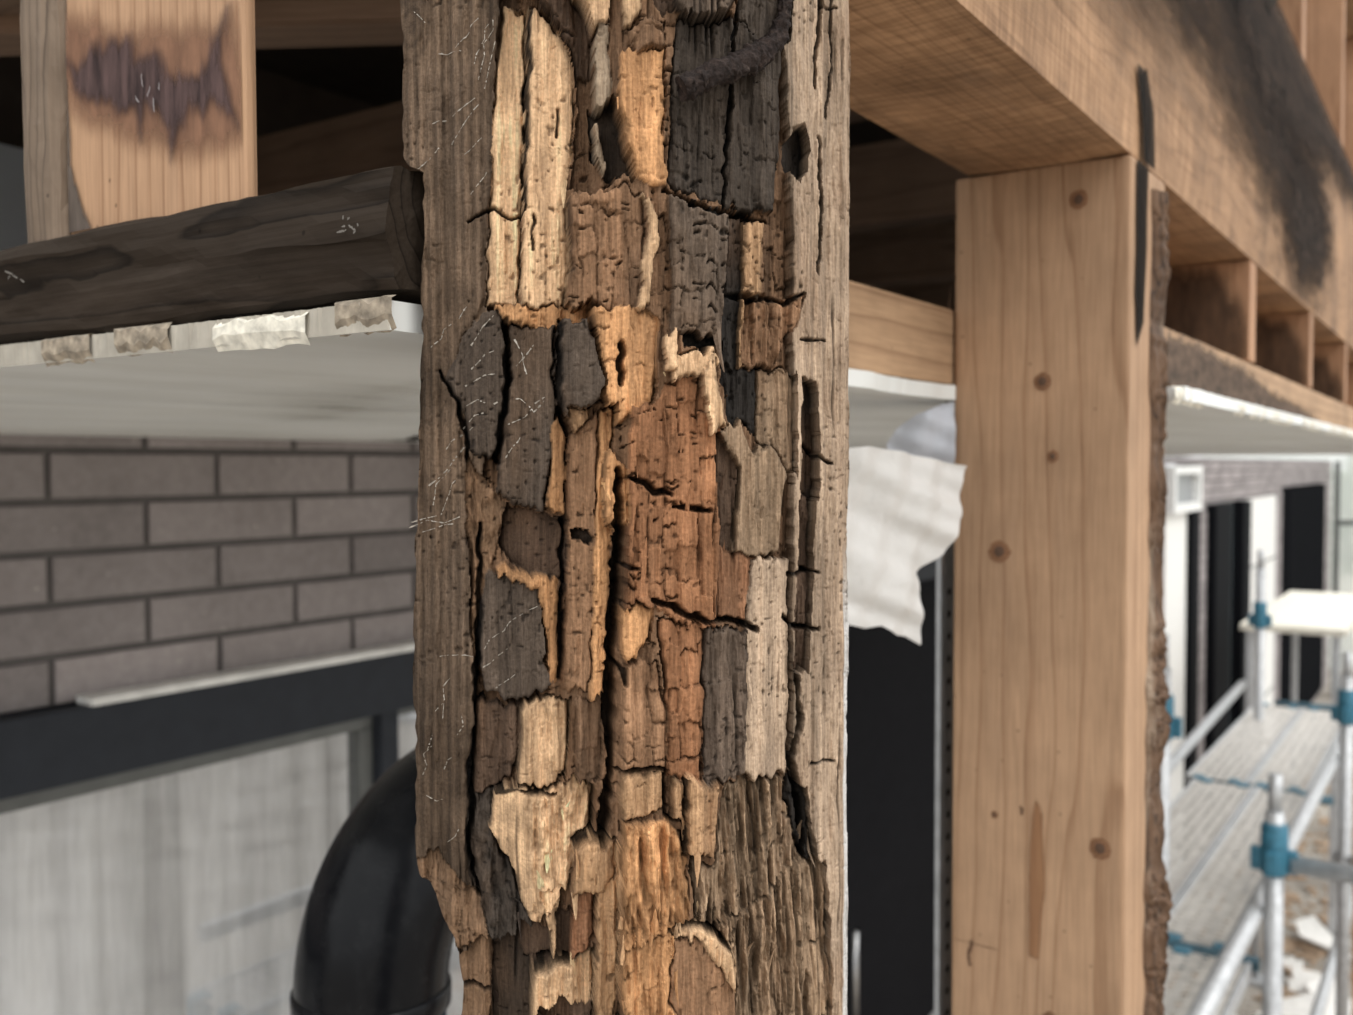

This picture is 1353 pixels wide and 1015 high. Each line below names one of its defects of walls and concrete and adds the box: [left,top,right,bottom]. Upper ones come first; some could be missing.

water stain [65,10,242,233]
crack [468,9,560,251]
crack [724,0,838,307]
water stain [1122,0,1353,298]
crack [440,317,515,465]
crack [466,522,558,898]
crack [556,516,568,682]
crack [615,342,627,387]
spalling [418,0,834,1015]
crack [570,467,820,859]
crack [785,673,834,856]
crack [670,919,732,956]